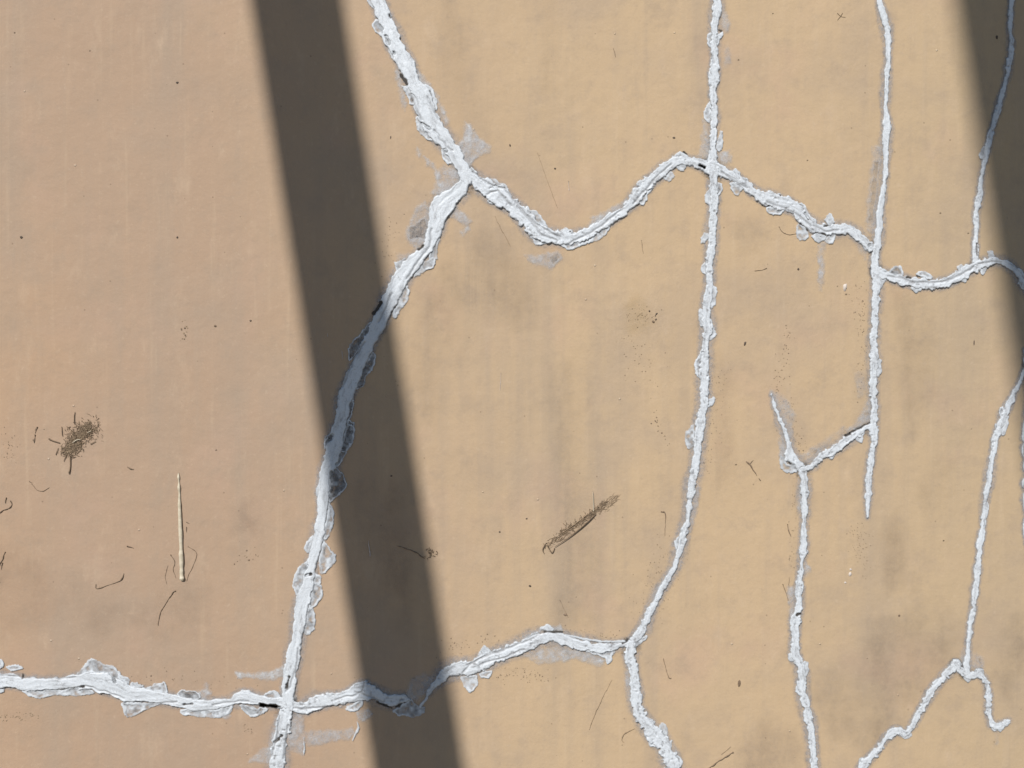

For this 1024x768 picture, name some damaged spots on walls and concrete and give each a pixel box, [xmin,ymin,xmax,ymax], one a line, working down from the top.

crack [0,167,723,768]
crack [367,0,1024,768]